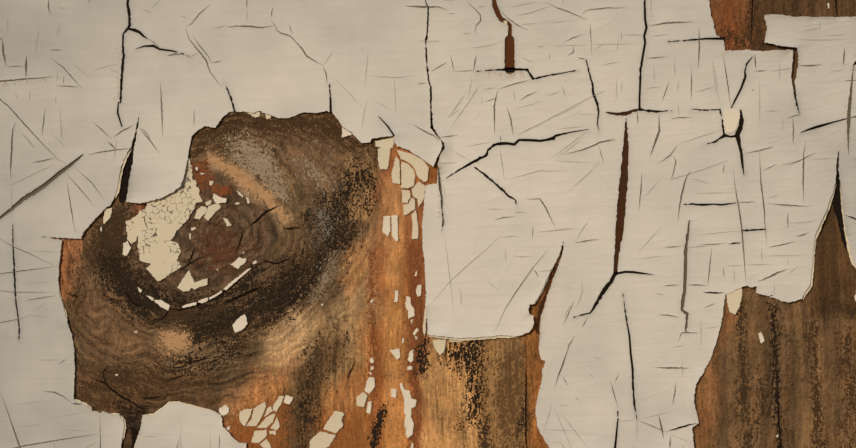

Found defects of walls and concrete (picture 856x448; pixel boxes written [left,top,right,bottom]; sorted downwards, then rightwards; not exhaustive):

crack [231,0,332,114]
peeling [709,0,856,92]
peeling [724,109,740,133]
crack [0,0,236,339]
crack [235,205,278,254]
crack [419,0,856,448]
crack [160,275,260,321]
peeling [52,111,564,448]
peeling [692,151,856,448]
crack [3,400,101,448]
crack [89,358,207,448]